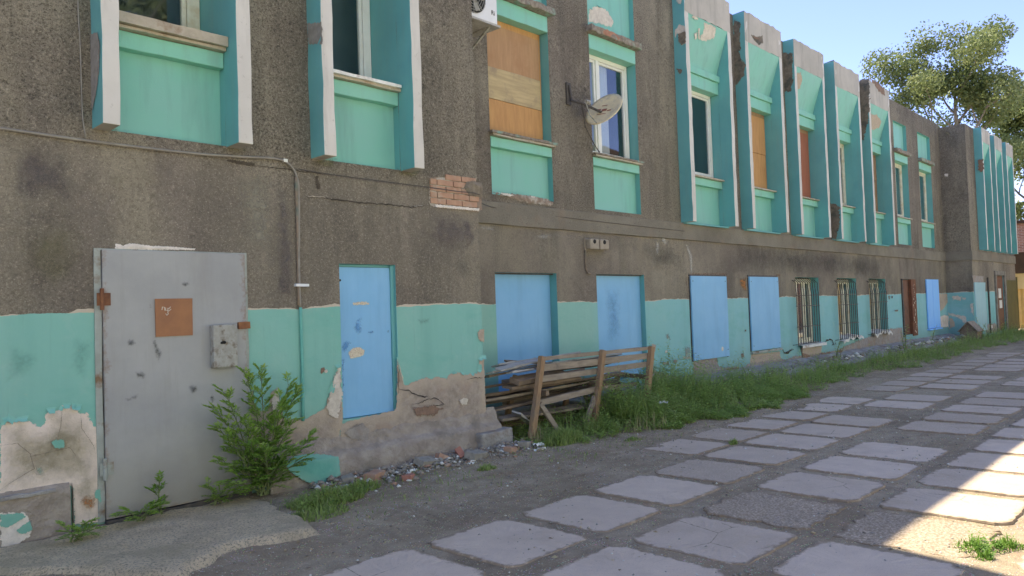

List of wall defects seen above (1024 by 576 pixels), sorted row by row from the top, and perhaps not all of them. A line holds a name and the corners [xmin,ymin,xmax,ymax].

peeling [588,5,620,41]
peeling [675,15,716,45]
peeling [733,20,763,85]
peeling [783,53,802,92]
crack [306,196,425,208]
spalling [429,174,553,212]
peeling [250,342,486,488]
peeling [0,403,102,525]